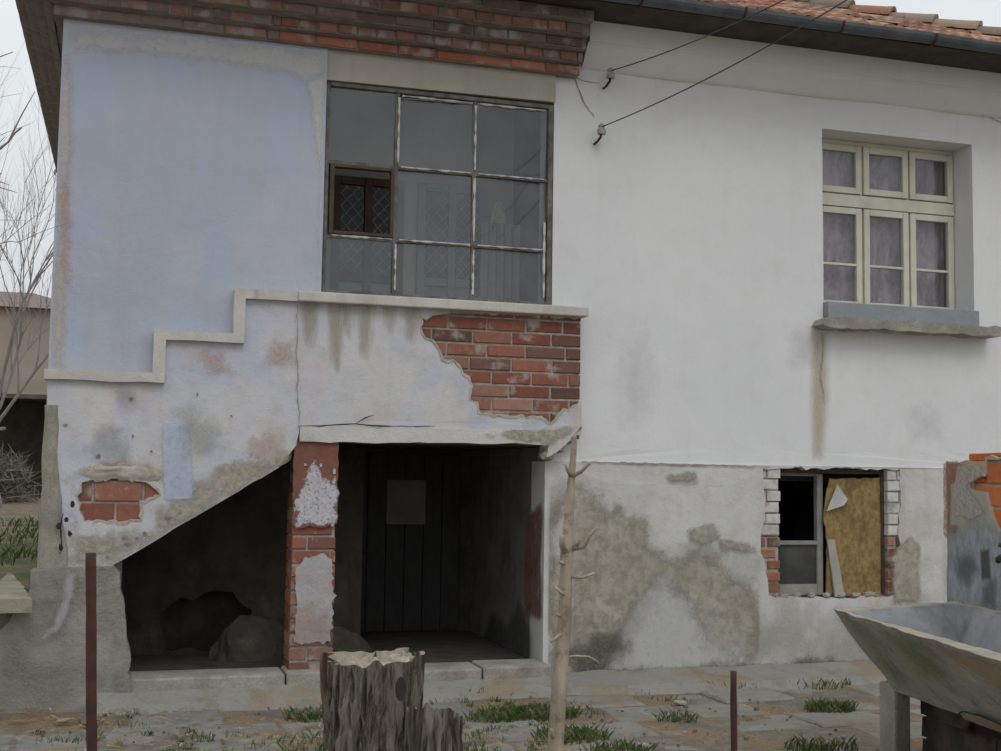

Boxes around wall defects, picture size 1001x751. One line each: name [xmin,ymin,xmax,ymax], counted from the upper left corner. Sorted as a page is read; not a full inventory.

crack [295,305,428,428]
flaking render [420,310,581,446]
flaking render [48,423,289,633]
peeling [294,462,339,527]
flaking render [761,536,780,598]
flaking render [884,536,900,597]
flaking render [969,453,1001,532]